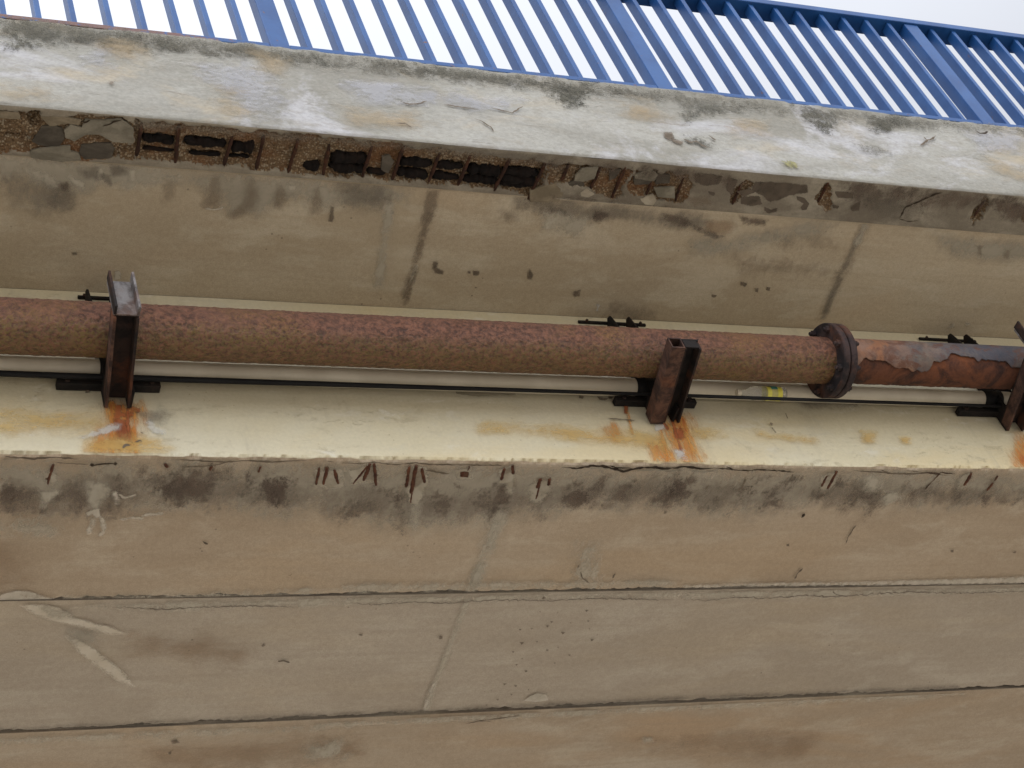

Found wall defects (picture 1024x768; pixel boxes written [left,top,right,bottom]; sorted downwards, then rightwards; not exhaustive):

spalling [0,110,861,224]
crack [900,193,940,222]
spalling [970,197,989,224]
rust [91,401,163,453]
rust [545,406,701,462]
leakage [0,460,1024,730]